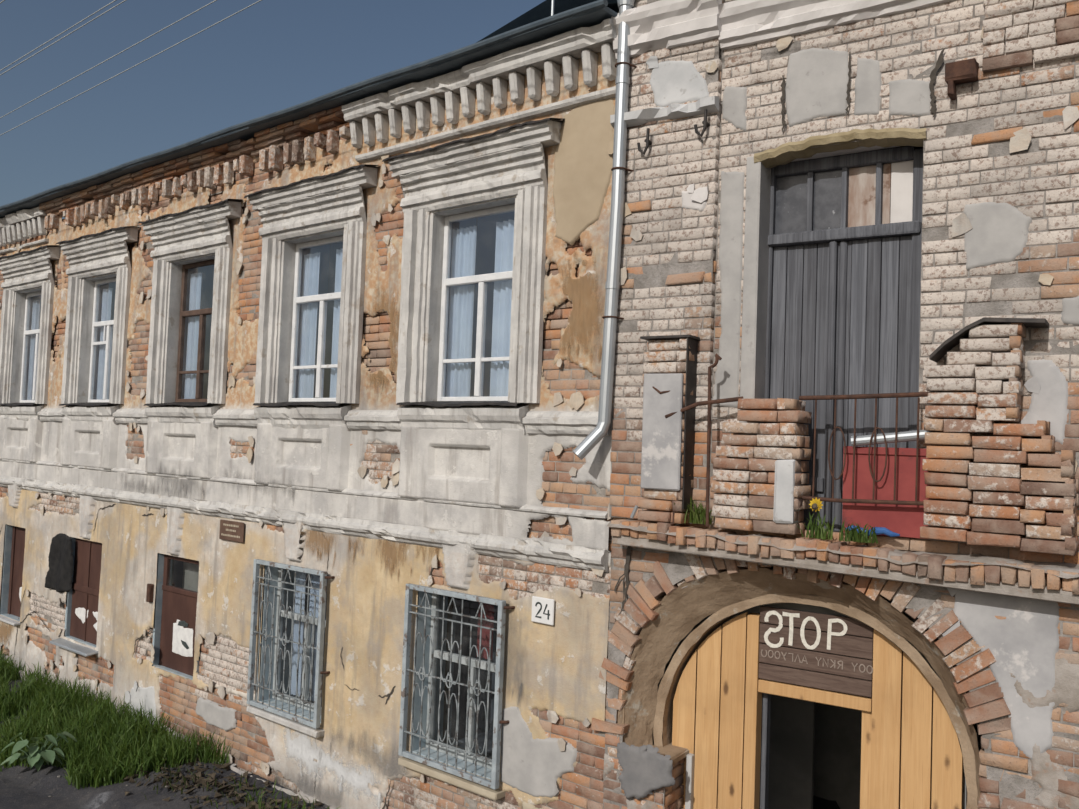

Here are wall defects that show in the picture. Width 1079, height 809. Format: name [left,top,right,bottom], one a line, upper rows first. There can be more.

flaking render [209,161,295,324]
flaking render [370,147,404,272]
flaking render [542,339,614,410]
flaking render [125,423,145,464]
flaking render [229,436,254,463]
flaking render [357,430,400,488]
flaking render [527,442,613,552]
flaking render [478,554,611,608]
flaking render [23,589,114,692]
flaking render [133,629,300,794]
flaking render [380,774,521,809]
flaking render [531,706,606,809]